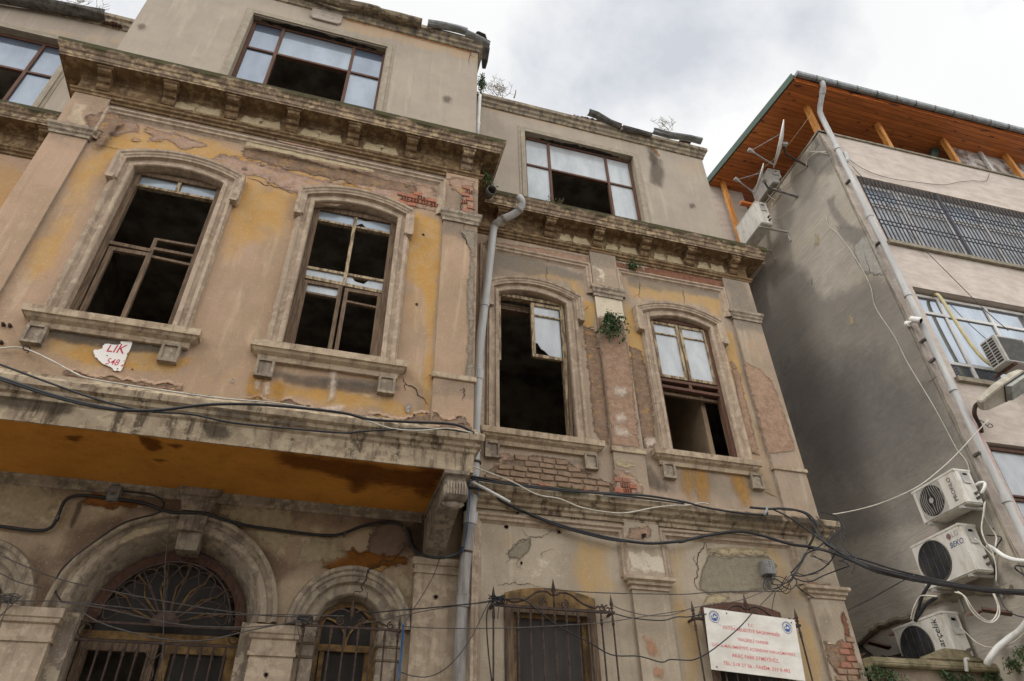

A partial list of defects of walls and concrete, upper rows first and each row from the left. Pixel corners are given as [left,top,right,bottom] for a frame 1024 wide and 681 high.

peeling [83,100,476,213]
water stain [648,146,662,185]
water stain [205,408,248,438]
spalling [730,361,795,455]
water stain [140,436,180,462]
water stain [280,454,444,496]
flaking render [485,453,645,494]
flaking render [321,523,410,573]
crack [349,543,405,602]
flaking render [823,611,862,681]